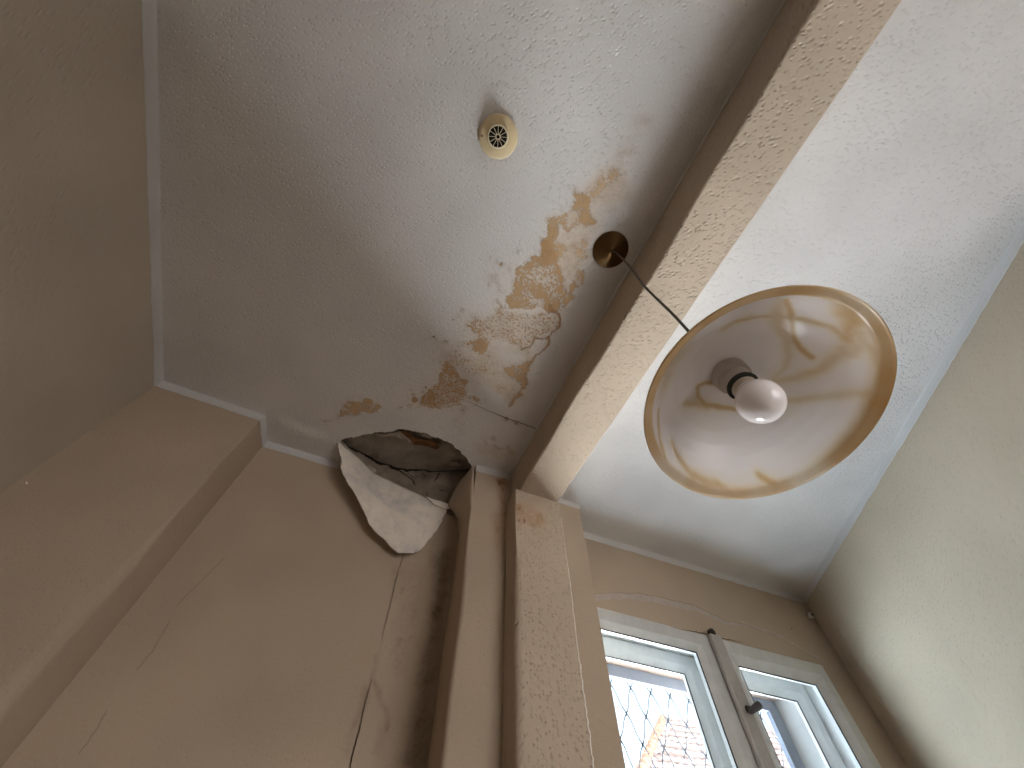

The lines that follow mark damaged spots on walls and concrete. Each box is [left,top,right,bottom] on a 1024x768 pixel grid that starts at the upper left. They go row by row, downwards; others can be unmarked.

leakage [412,173,618,409]
flaking render [349,448,469,516]
crack [350,679,372,768]